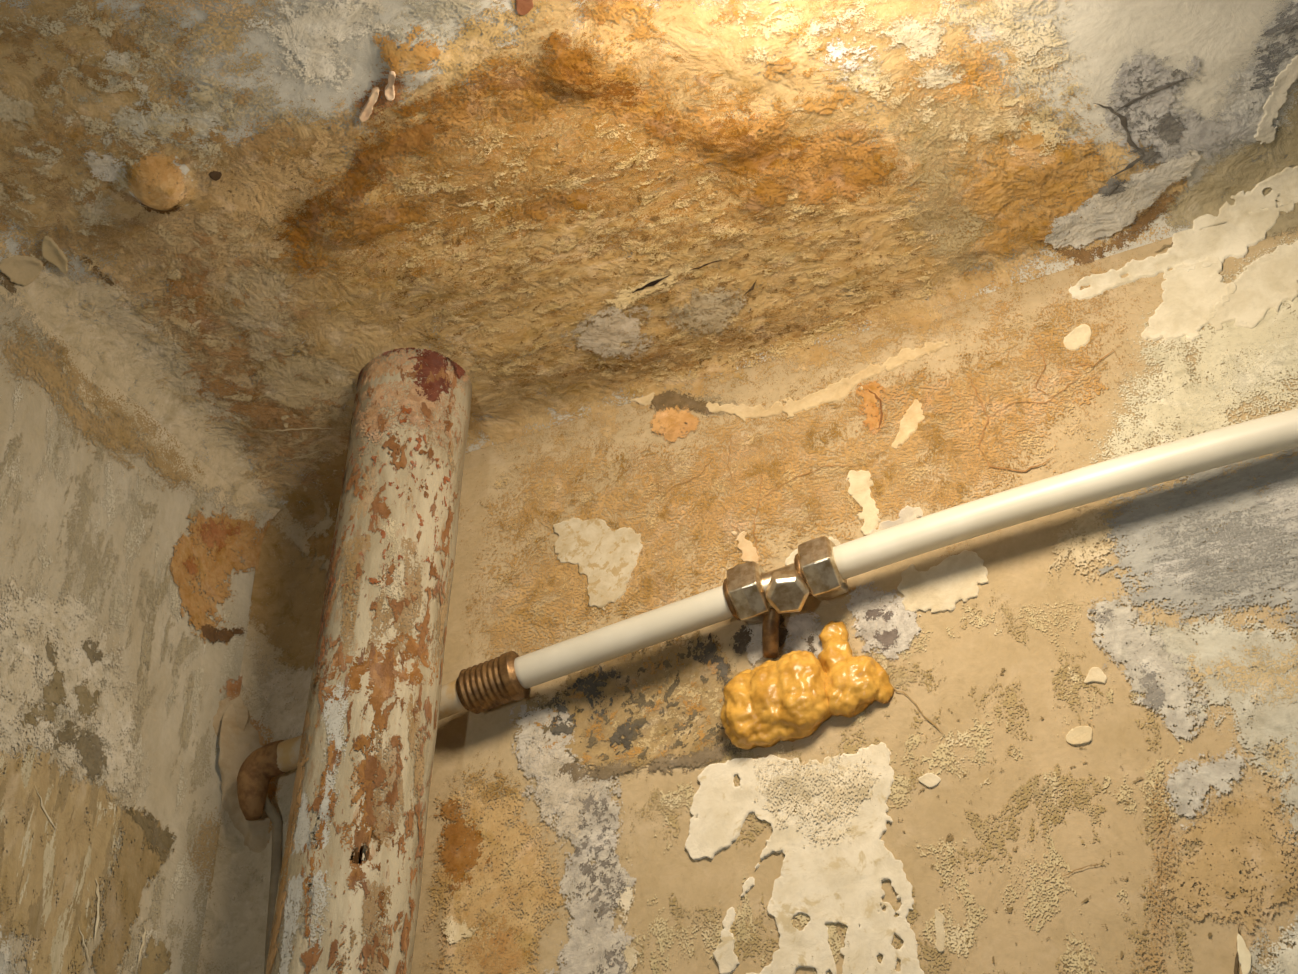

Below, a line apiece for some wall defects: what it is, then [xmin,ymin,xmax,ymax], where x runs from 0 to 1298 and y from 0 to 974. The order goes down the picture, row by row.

leakage [0,0,1298,663]
leakage [111,552,220,857]
leakage [122,865,218,974]
corrosion [265,348,570,974]
peeling [509,447,1298,974]